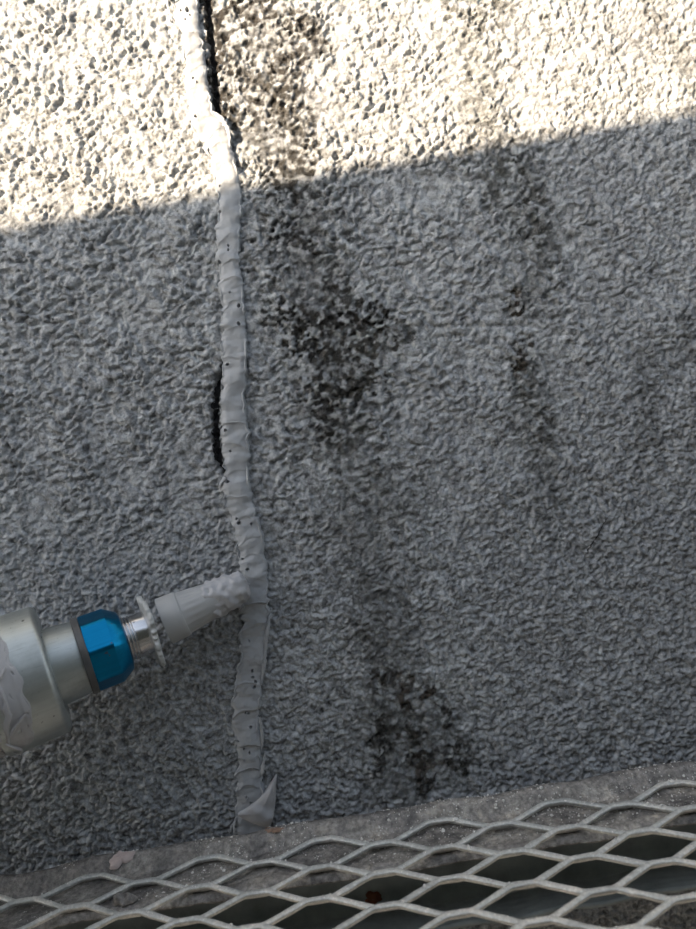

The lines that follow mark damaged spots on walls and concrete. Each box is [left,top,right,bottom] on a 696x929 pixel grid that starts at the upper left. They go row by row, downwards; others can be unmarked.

crack [204,0,221,115]
leakage [199,0,332,202]
leakage [271,223,320,258]
leakage [261,265,415,448]
crack [210,377,225,470]
leakage [368,669,471,798]